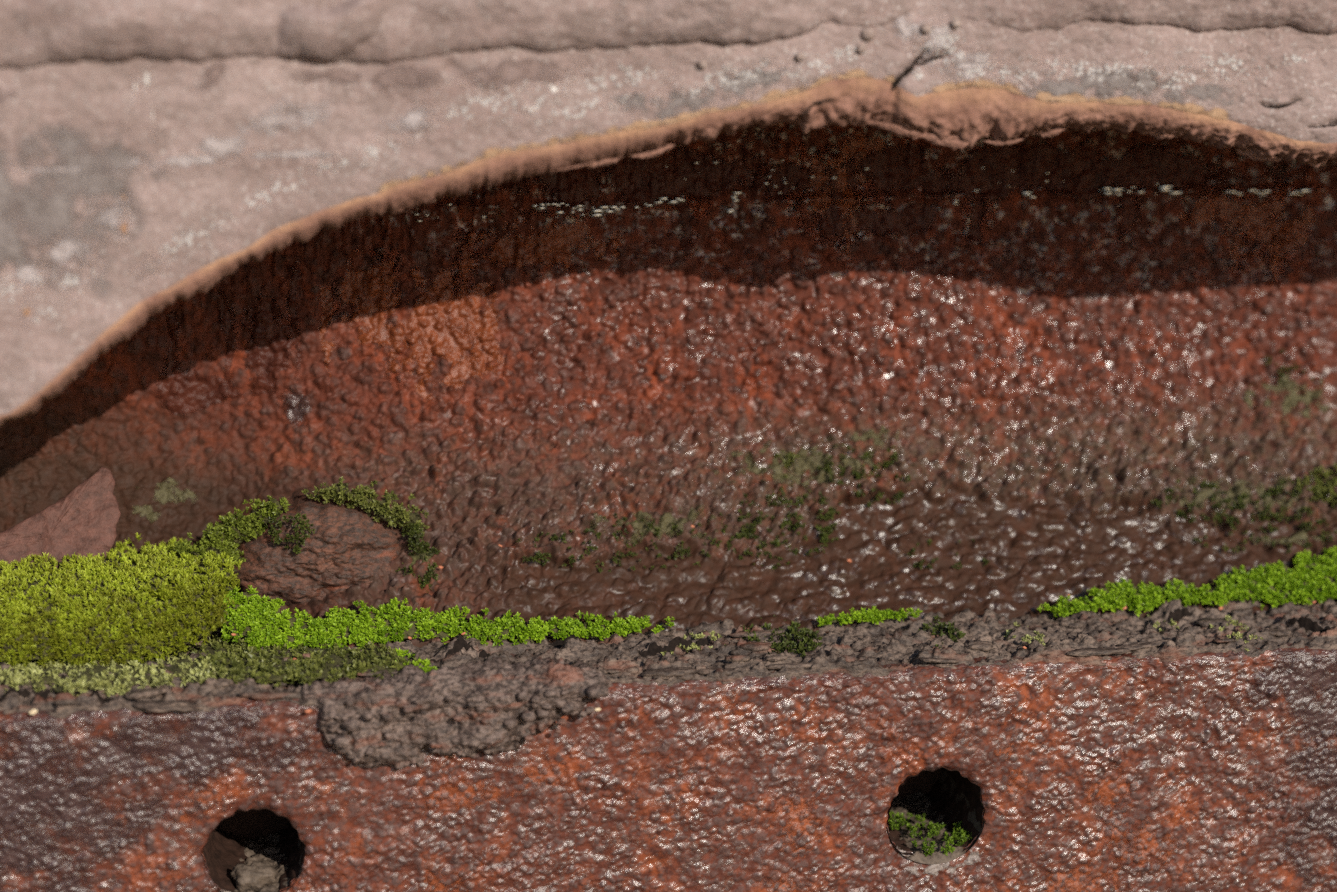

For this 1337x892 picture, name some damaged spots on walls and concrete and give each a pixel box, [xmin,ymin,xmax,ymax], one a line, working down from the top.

rust [379,69,867,192]
crack [802,98,834,115]
crack [876,52,945,103]
rust [932,78,1228,120]
rust [318,217,623,415]
rust [0,466,121,570]
rust [424,870,468,892]
rust [1045,769,1189,892]